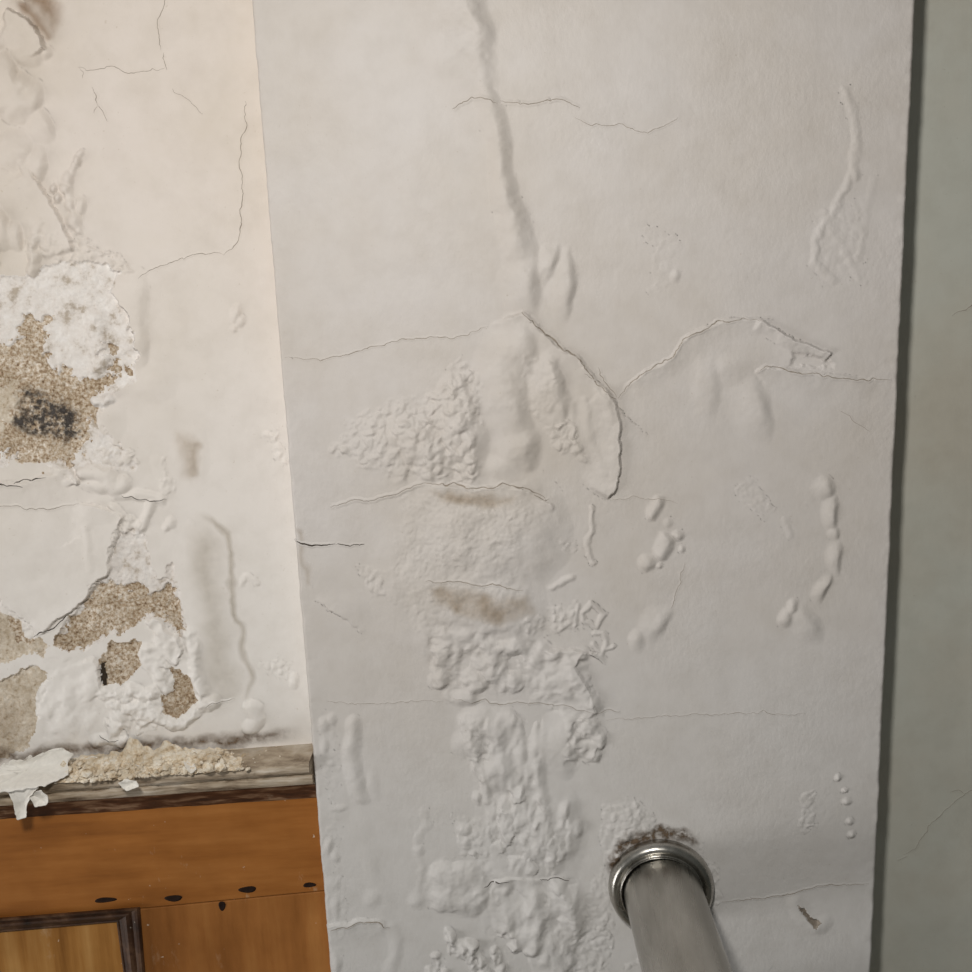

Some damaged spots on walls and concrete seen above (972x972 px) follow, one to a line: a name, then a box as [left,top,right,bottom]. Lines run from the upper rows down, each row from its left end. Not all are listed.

crack [78,0,204,123]
crack [451,94,679,135]
crack [137,101,249,280]
crack [285,325,488,363]
crack [520,310,760,401]
crack [754,363,892,384]
crack [0,475,79,512]
flaking render [0,260,212,760]
crack [120,494,167,504]
peeling [573,717,609,765]
flaking render [118,778,139,791]
peeling [784,890,834,937]